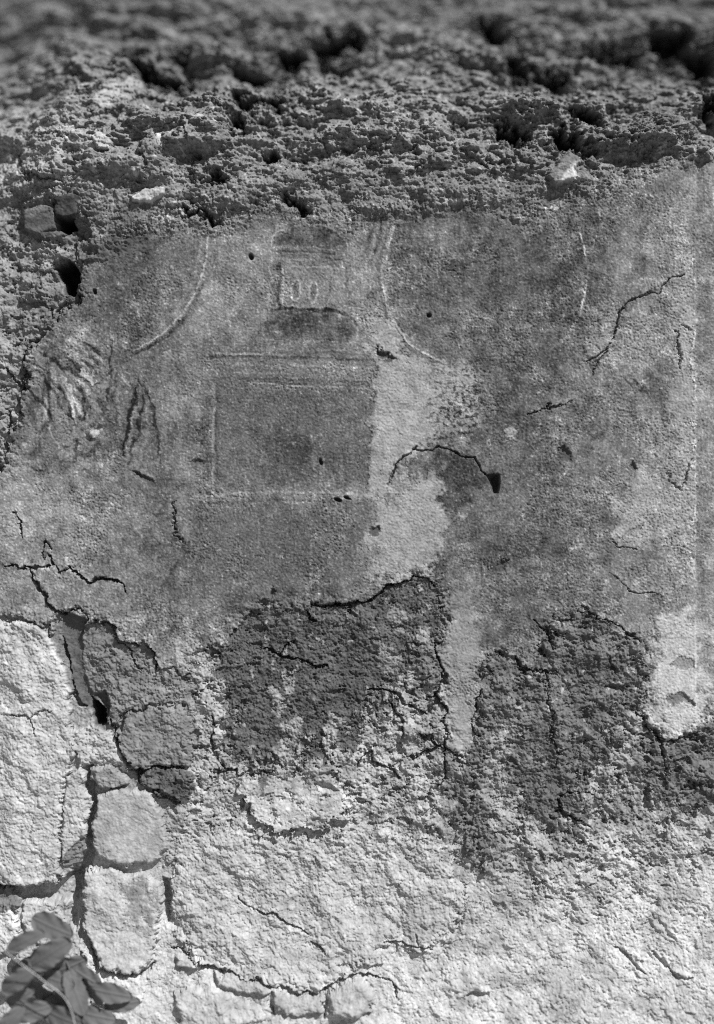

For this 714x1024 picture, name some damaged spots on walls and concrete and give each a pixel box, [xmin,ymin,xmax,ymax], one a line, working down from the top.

hole [113,49,201,98]
hole [221,24,372,139]
hole [470,11,611,159]
hole [573,16,714,129]
crack [5,510,159,672]
crack [109,719,185,805]
crack [210,716,274,779]
spalling [214,573,451,785]
crack [259,575,438,669]
crack [355,641,483,787]
crack [515,655,597,823]
spalling [465,610,650,857]